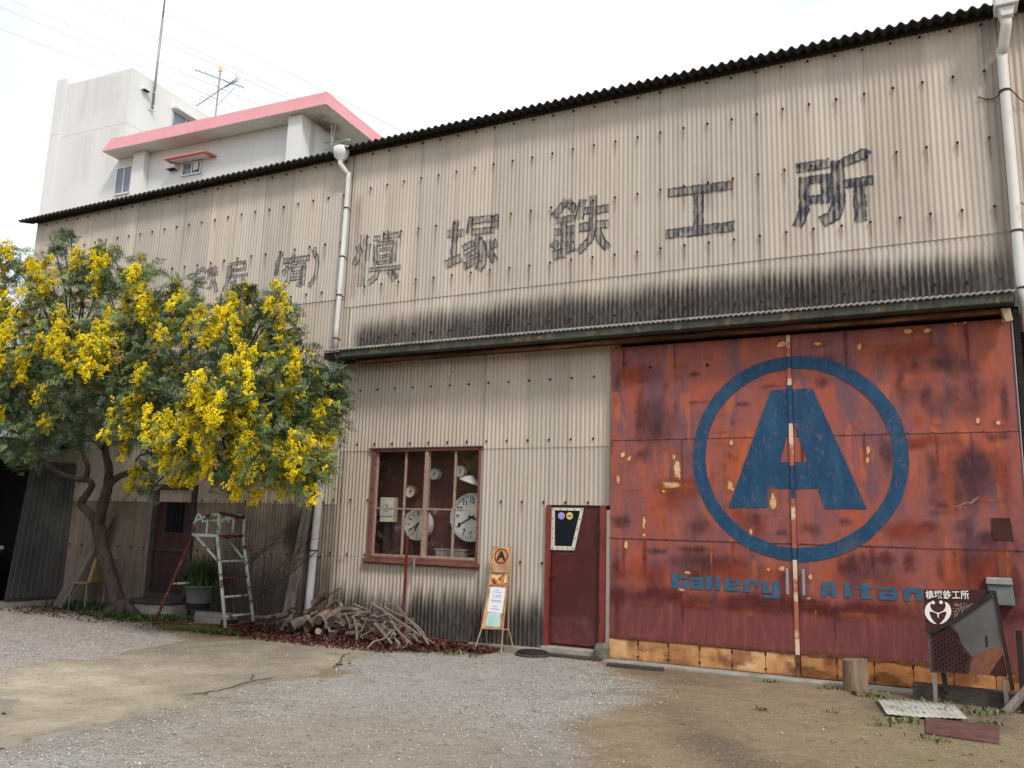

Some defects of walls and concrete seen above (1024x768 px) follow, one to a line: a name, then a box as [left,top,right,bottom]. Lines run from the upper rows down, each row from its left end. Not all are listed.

damp [357,256,1015,347]
peeling [662,455,688,492]
damp [188,571,303,624]
damp [316,589,543,648]